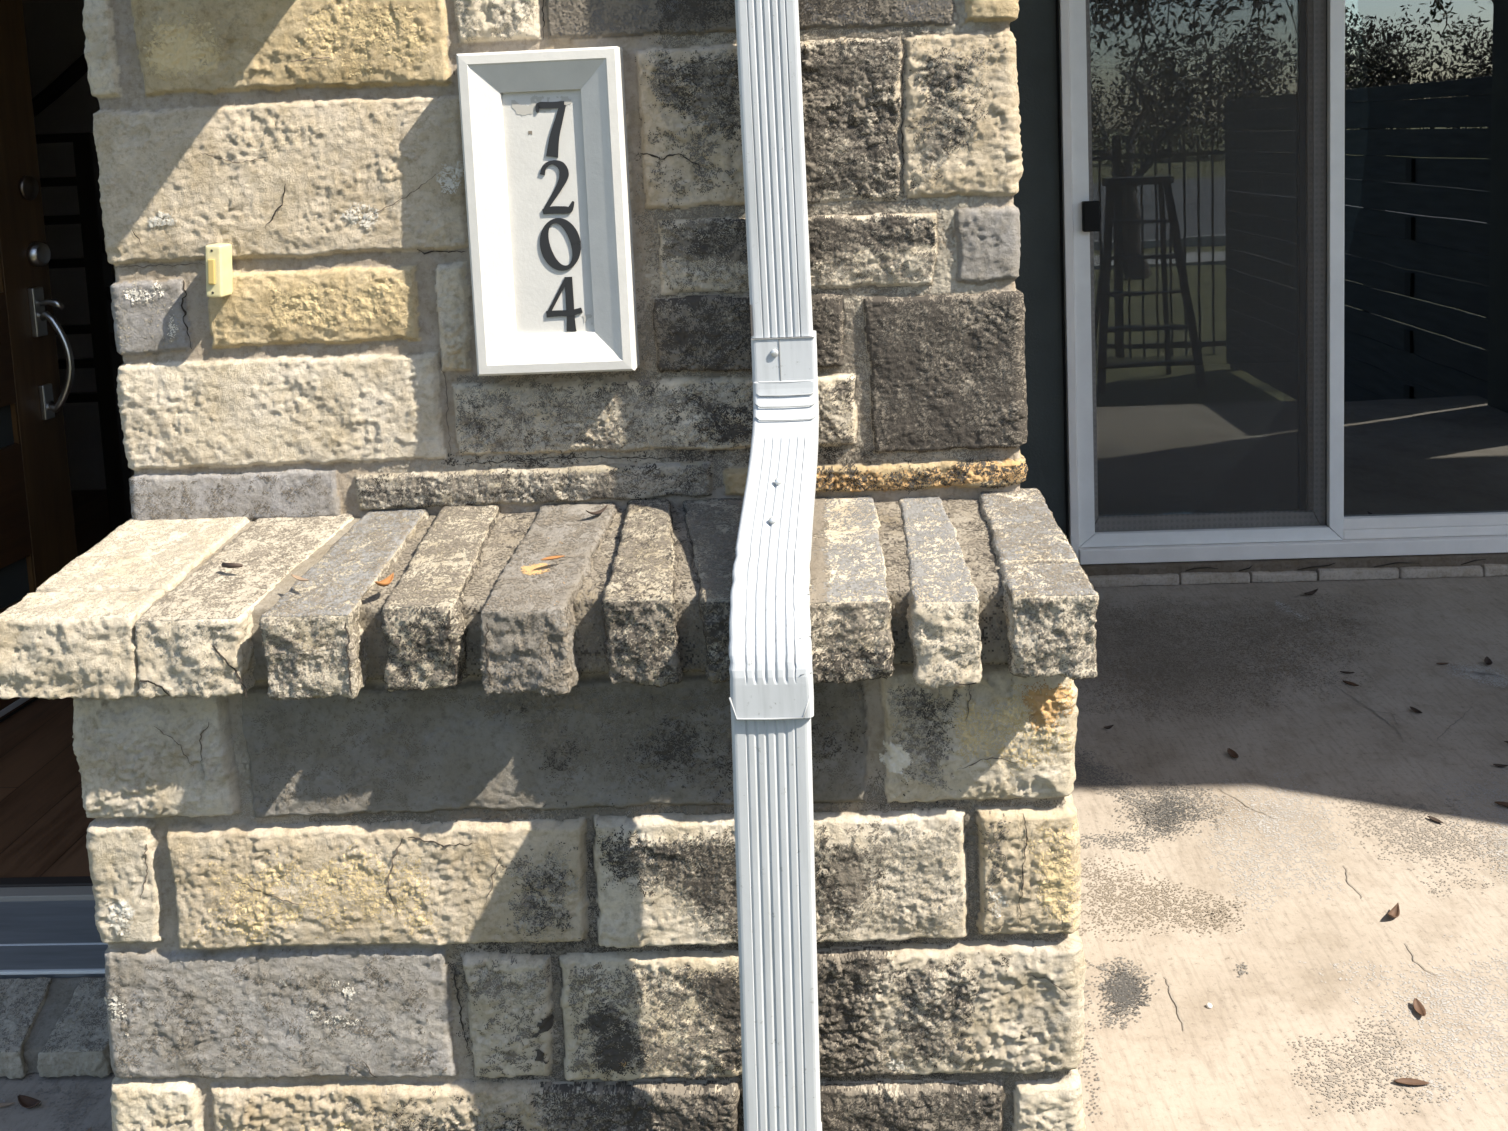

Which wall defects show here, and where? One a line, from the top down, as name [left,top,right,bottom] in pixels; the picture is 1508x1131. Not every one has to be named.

crack [387,837,501,921]
leakage [140,0,753,1131]
leakage [798,0,1247,1131]
crack [1018,814,1028,923]